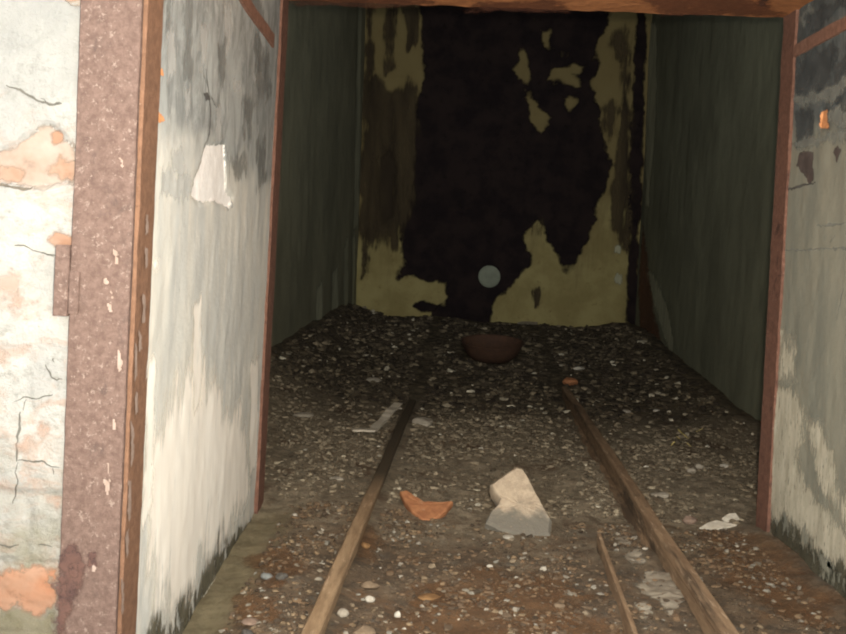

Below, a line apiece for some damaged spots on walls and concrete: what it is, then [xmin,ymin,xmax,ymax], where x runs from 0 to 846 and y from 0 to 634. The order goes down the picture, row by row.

crack [6,85,62,106]
water stain [183,0,193,79]
water stain [218,37,226,86]
water stain [243,33,271,187]
peeling [793,41,846,183]
spalling [0,125,75,191]
crack [12,358,60,504]
water stain [142,294,259,634]
water stain [771,328,846,600]
peeling [0,564,59,616]
rust [51,544,97,634]